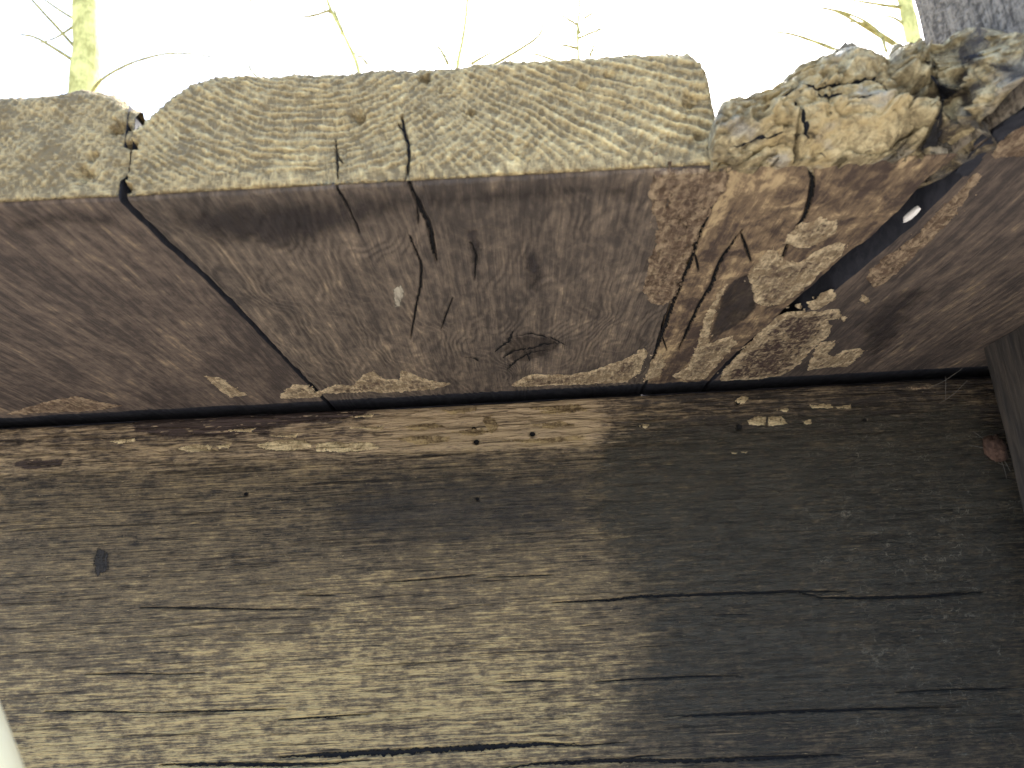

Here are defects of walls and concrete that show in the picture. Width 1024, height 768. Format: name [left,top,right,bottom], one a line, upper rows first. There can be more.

crack [782,168,815,256]
crack [398,119,437,336]
peeling [642,161,730,305]
peeling [512,217,867,387]
crack [652,223,751,359]
peeling [280,370,450,399]
peeling [747,408,789,426]
peeling [803,404,851,425]
crack [142,595,331,610]
crack [556,590,979,615]
crack [666,688,1023,717]
crack [163,742,838,768]